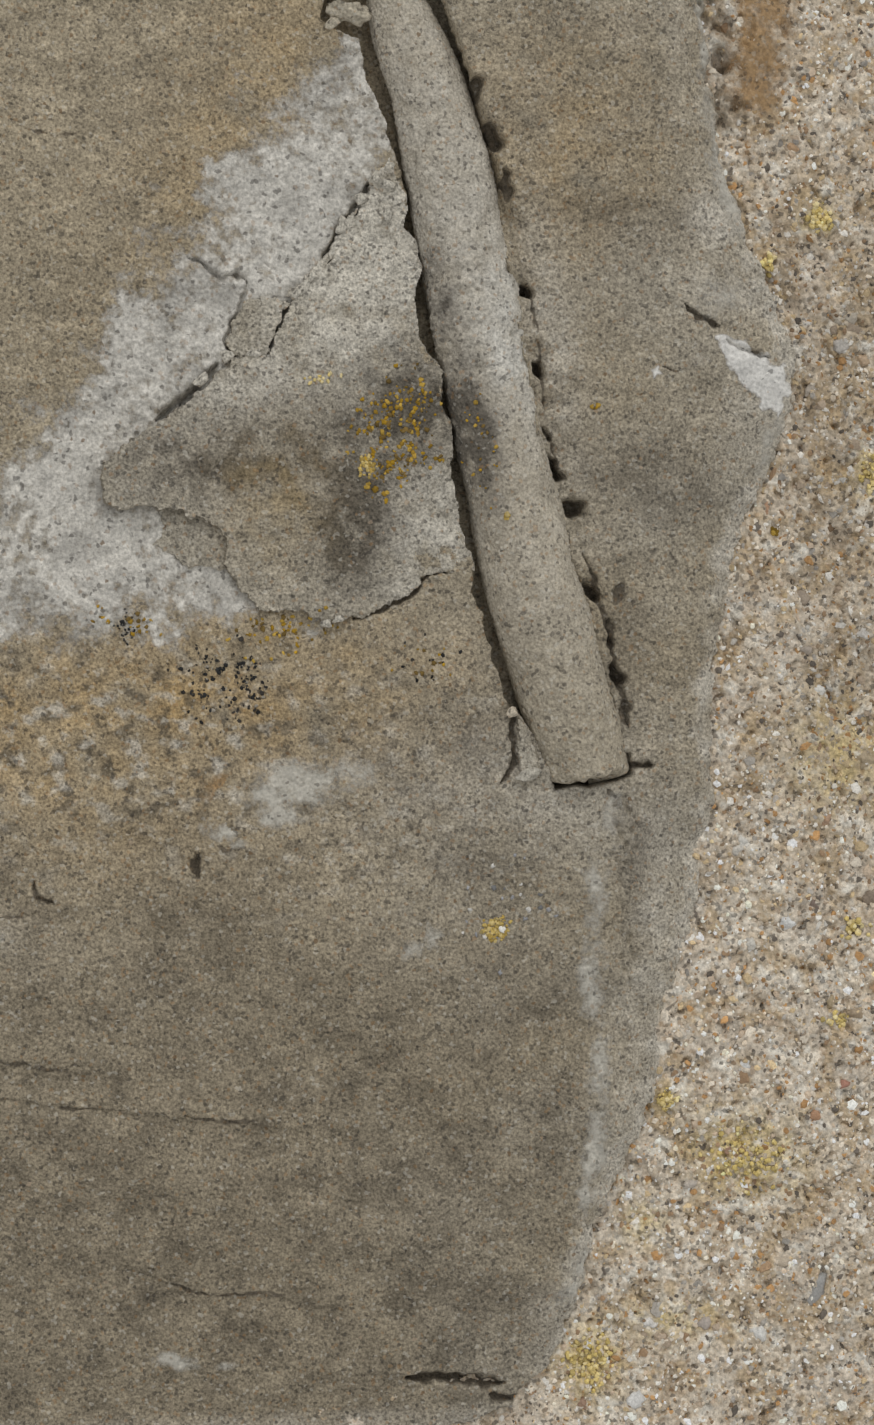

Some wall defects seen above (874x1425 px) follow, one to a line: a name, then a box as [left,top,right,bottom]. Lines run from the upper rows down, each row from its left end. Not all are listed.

crack [194,258,239,280]
peeling [0,34,475,646]
crack [354,572,446,619]
crack [2,1062,80,1072]
crack [60,1104,83,1112]
crack [191,1117,252,1125]
crack [405,1371,516,1401]